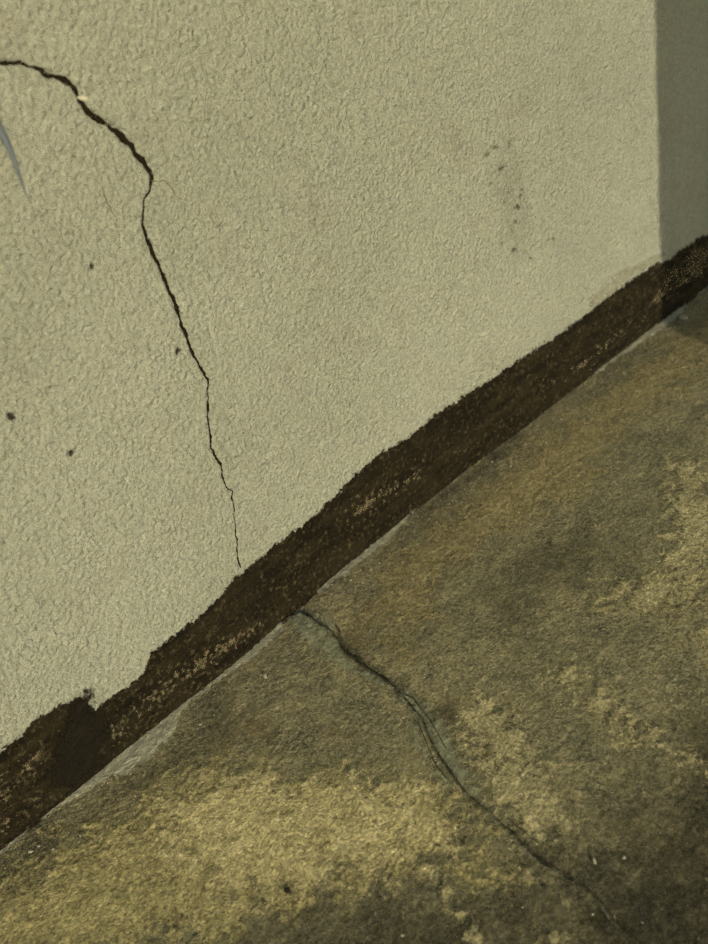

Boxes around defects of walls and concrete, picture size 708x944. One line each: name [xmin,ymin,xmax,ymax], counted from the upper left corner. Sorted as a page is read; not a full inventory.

crack [0,60,241,568]
crack [286,609,638,944]